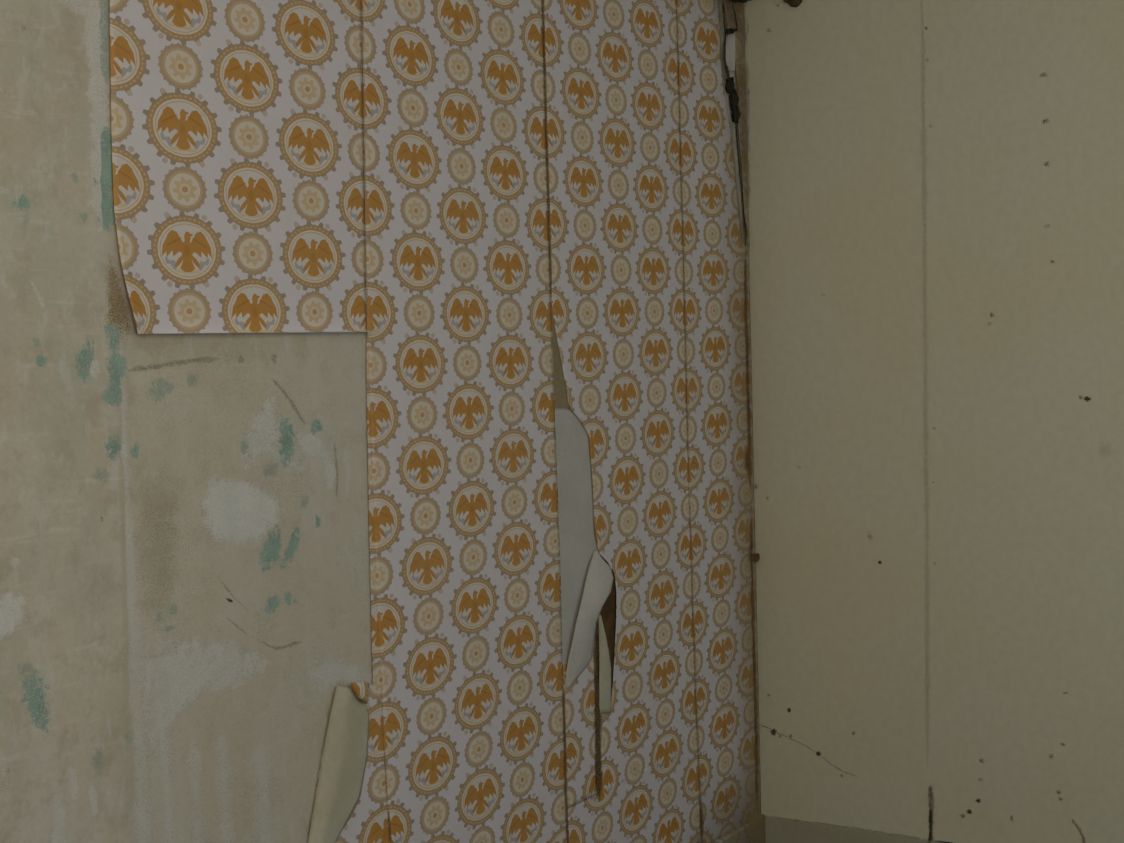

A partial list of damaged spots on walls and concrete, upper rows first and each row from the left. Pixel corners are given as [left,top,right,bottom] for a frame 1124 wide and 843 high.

peeling [71,0,115,232]
peeling [74,324,127,407]
peeling [16,665,53,736]